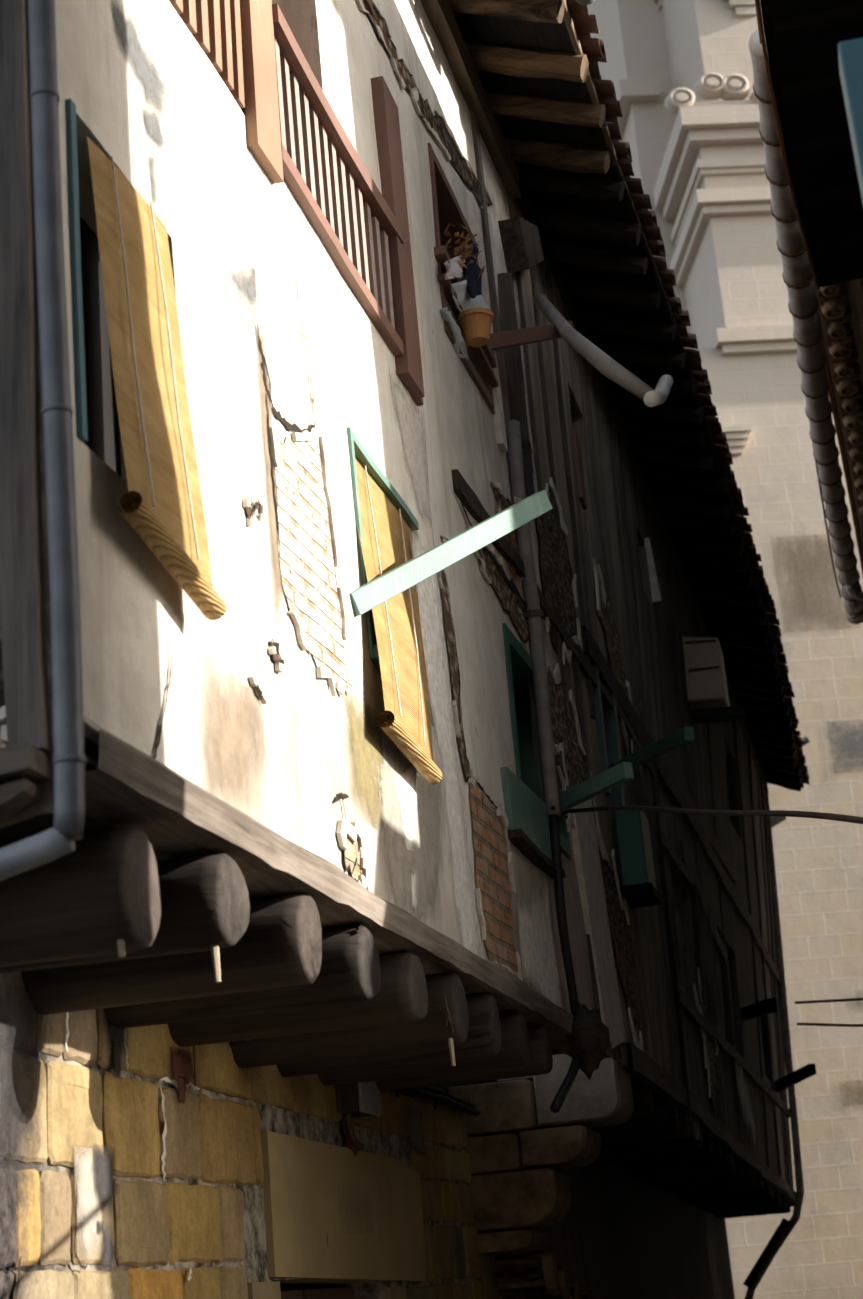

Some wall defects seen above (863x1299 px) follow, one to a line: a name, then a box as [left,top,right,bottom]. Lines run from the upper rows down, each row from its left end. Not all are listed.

spalling [520,345,534,498]
spalling [0,630,8,748]
spalling [248,676,267,704]
spalling [242,427,353,697]
spalling [490,479,512,513]
spalling [474,529,530,644]
spalling [536,477,592,793]
spalling [592,558,632,704]
water stain [775,534,851,632]
spalling [437,570,523,981]
spalling [593,797,643,1051]